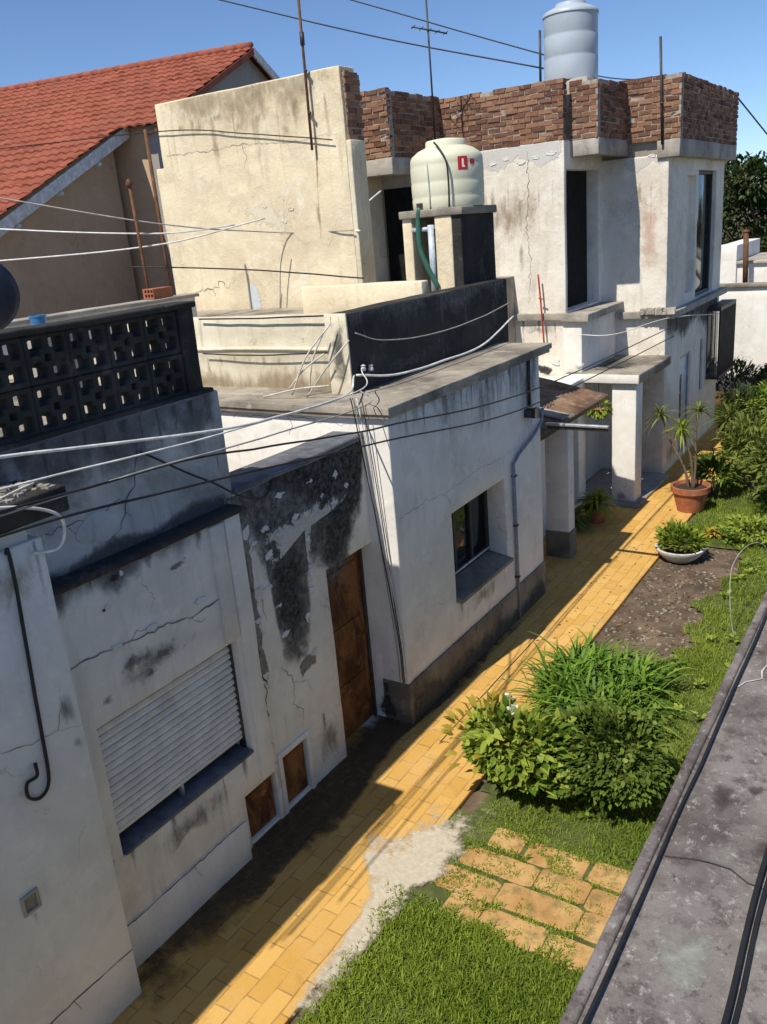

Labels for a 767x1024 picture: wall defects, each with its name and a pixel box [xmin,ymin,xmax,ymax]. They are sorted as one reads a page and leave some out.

peeling [481,140,562,172]
crack [45,452,137,537]
water stain [50,440,362,659]
crack [70,596,219,671]
peeling [241,470,349,716]